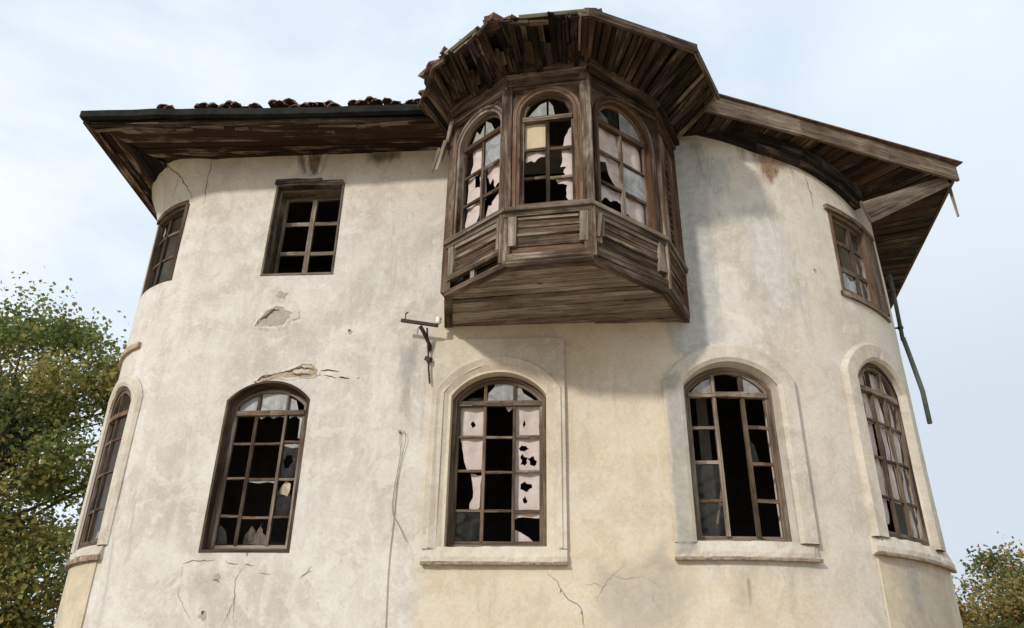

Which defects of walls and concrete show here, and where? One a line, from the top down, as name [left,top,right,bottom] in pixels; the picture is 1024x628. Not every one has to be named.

crack [166,163,211,202]
flaking render [252,291,300,332]
flaking render [253,362,322,383]
crack [178,555,265,621]
crack [546,560,667,624]